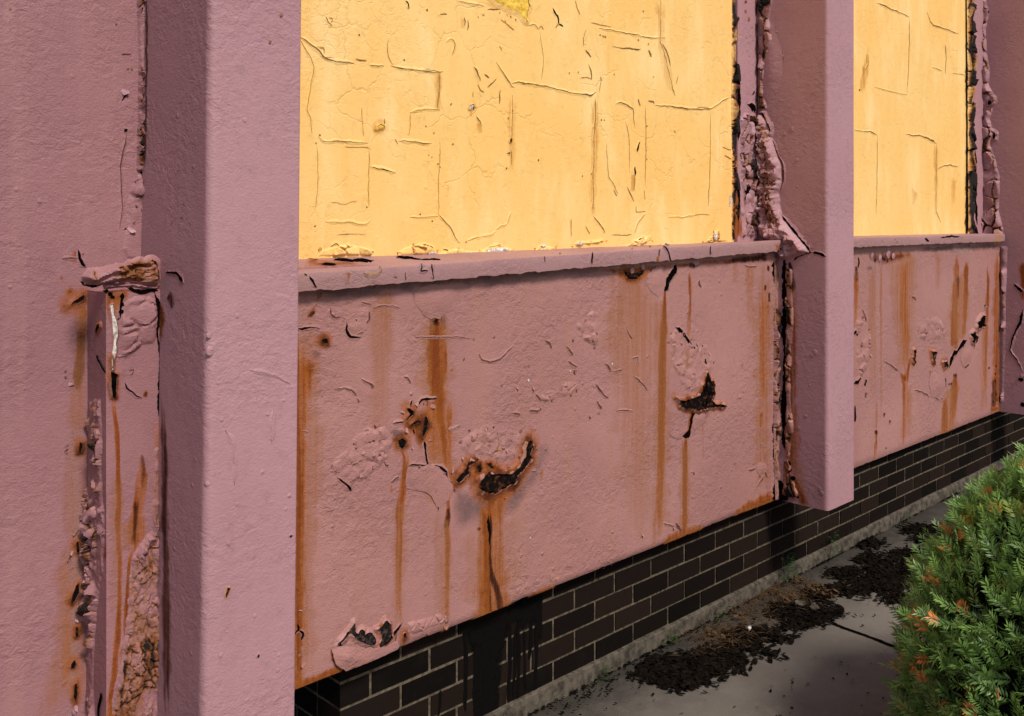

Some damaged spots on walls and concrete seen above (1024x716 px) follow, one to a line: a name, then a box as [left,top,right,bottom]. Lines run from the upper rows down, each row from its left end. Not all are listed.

peeling [66,398,160,716]
rust [108,406,147,709]
rust [295,347,343,689]
rust [393,318,542,617]
crack [301,0,783,292]
rust [657,291,727,544]
peeling [660,325,727,415]
peeling [739,0,811,504]
crack [855,129,878,208]
crack [876,2,975,126]
crack [907,133,978,242]
peeling [981,0,1004,234]